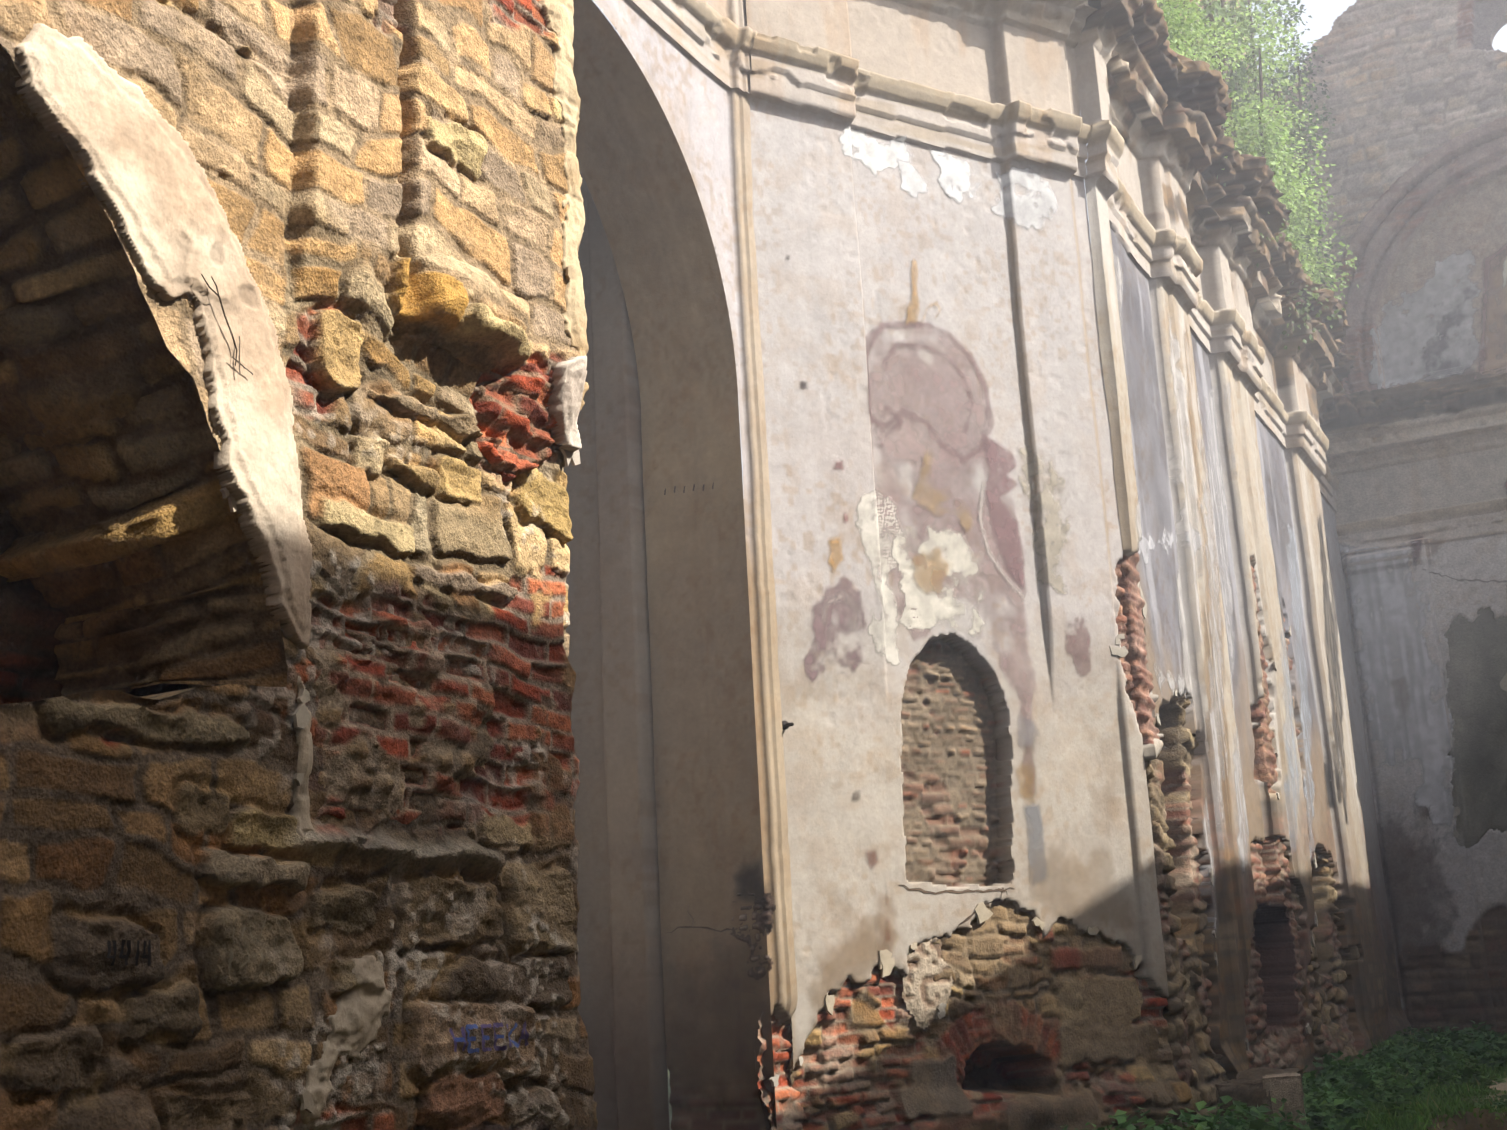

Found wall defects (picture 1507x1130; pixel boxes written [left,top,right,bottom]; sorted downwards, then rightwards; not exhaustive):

peeling [9,23,495,837]
peeling [1368,250,1482,389]
flaking render [757,523,1229,1130]
flaking render [1250,557,1301,800]
peeling [1444,607,1507,848]